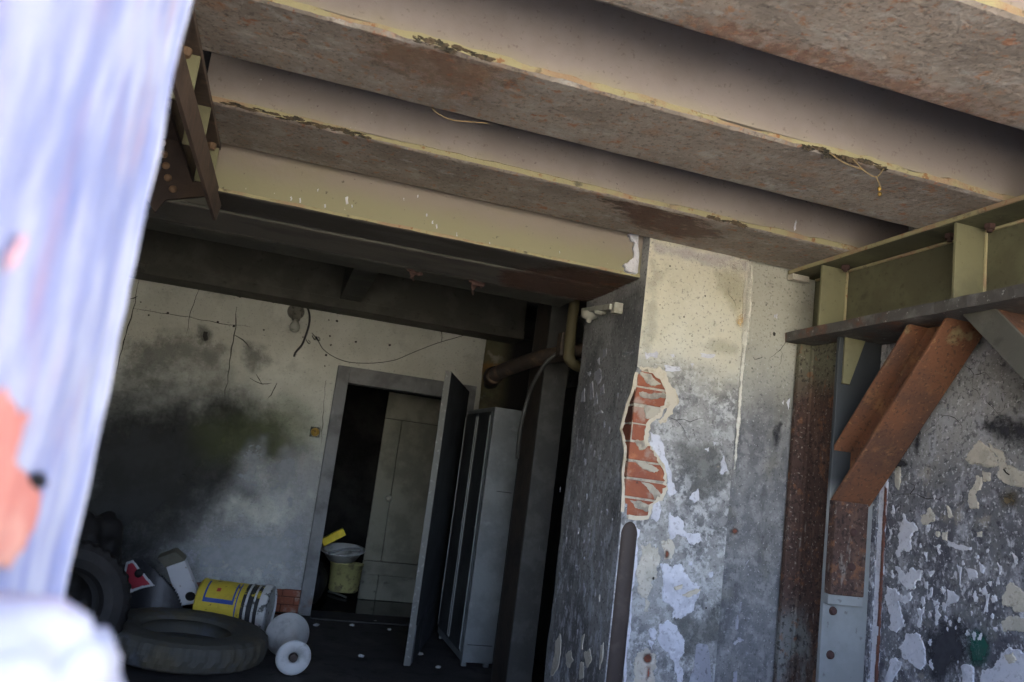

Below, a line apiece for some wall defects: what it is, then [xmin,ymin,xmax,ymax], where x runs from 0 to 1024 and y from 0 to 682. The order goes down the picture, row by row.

rust [599,199,724,240]
crack [116,281,277,398]
peeling [705,442,728,475]
flaking render [965,440,1024,509]
flaking render [565,348,716,682]
peeling [884,495,1024,682]
flaking render [551,629,604,680]